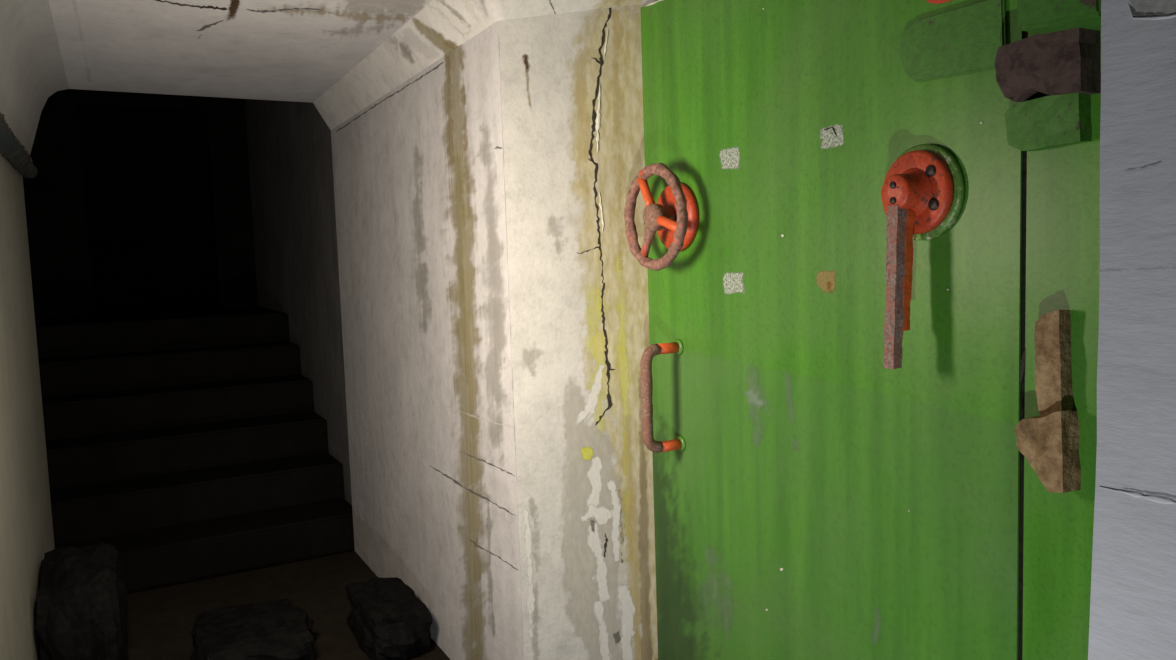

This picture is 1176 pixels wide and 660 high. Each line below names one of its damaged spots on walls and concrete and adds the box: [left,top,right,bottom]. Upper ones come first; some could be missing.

corrosion [228,0,240,19]
crack [156,0,319,39]
peeling [1128,0,1176,20]
leakage [318,0,493,660]
crack [576,8,615,425]
leakage [572,0,658,660]
peeling [562,365,635,660]